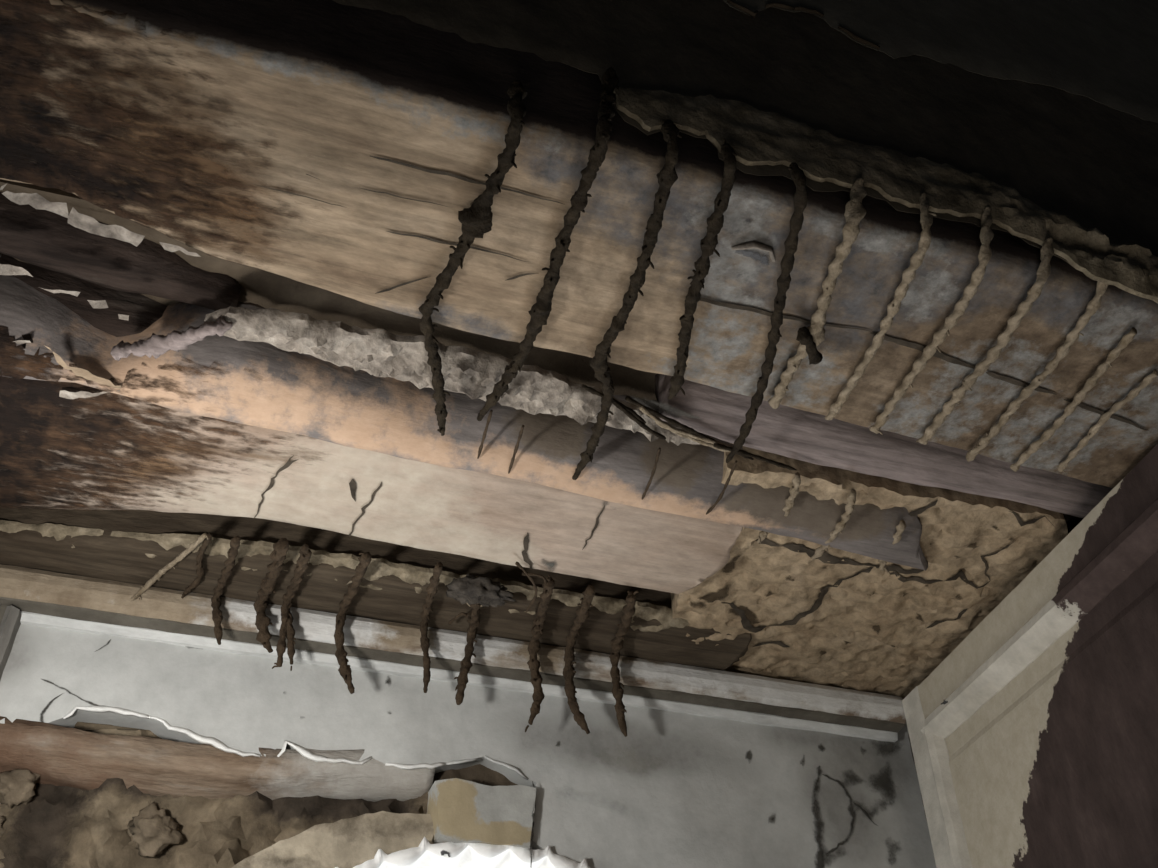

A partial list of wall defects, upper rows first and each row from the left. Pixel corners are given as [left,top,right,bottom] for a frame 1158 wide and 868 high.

water stain [0,0,297,264]
spalling [333,0,1158,304]
flaking render [0,184,145,247]
flaking render [0,264,129,321]
flaking render [13,340,121,399]
spalling [204,306,743,449]
crack [908,500,938,516]
crack [721,511,1055,648]
spalling [63,705,261,757]
spalling [277,740,372,765]
spalling [0,755,528,868]
crack [812,766,878,868]